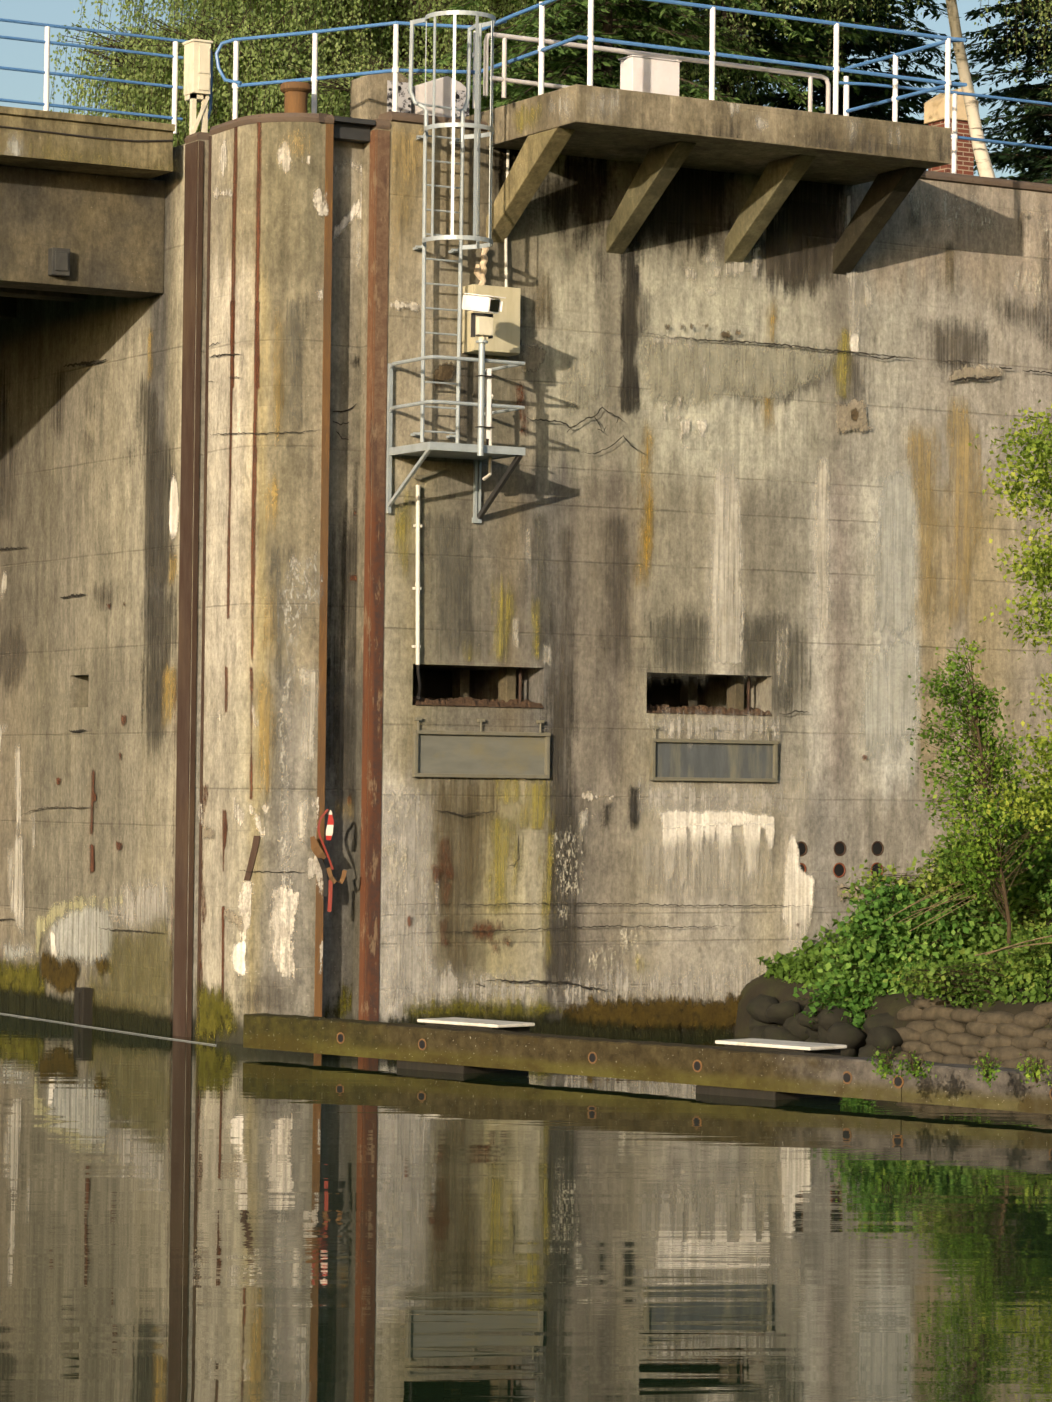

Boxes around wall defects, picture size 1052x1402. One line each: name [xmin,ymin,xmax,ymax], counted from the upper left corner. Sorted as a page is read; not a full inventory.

water stain [492,148,520,190]
water stain [534,155,617,241]
water stain [620,167,873,413]
crack [527,407,646,455]